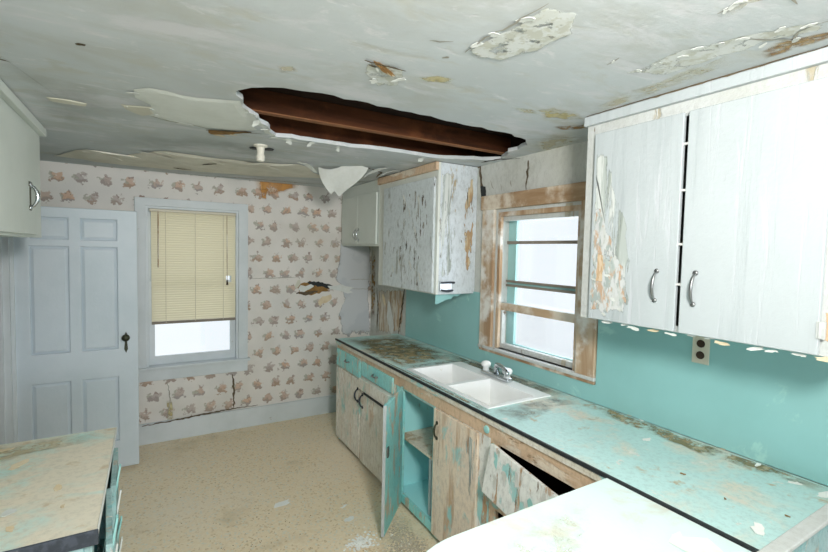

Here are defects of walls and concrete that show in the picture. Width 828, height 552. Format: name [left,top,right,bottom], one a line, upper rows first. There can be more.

peeling [364,60,406,86]
peeling [465,3,577,60]
peeling [628,21,828,75]
peeling [121,88,318,147]
hole [295,280,354,306]
crack [142,374,256,427]